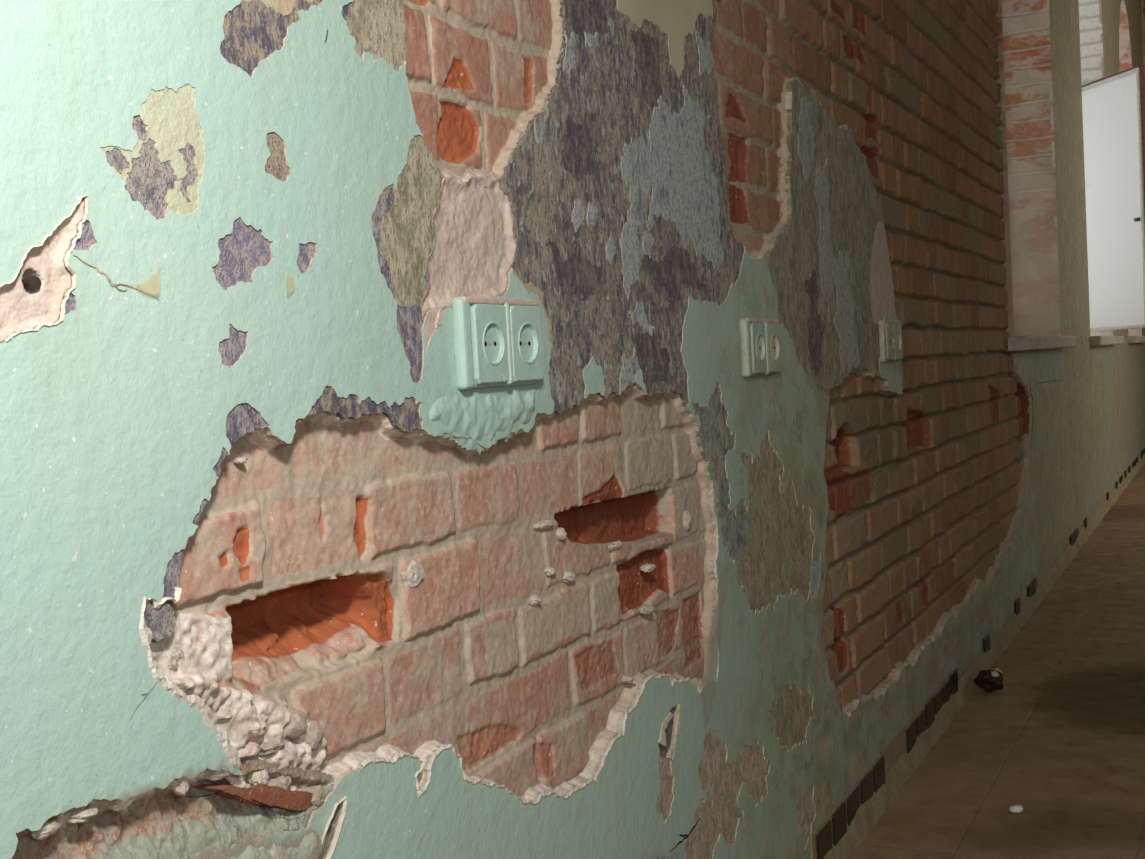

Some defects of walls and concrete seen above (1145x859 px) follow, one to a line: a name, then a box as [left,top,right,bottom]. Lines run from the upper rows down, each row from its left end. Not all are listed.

peeling [101,84,205,219]
flaking render [0,196,96,342]
flaking render [139,0,1030,823]